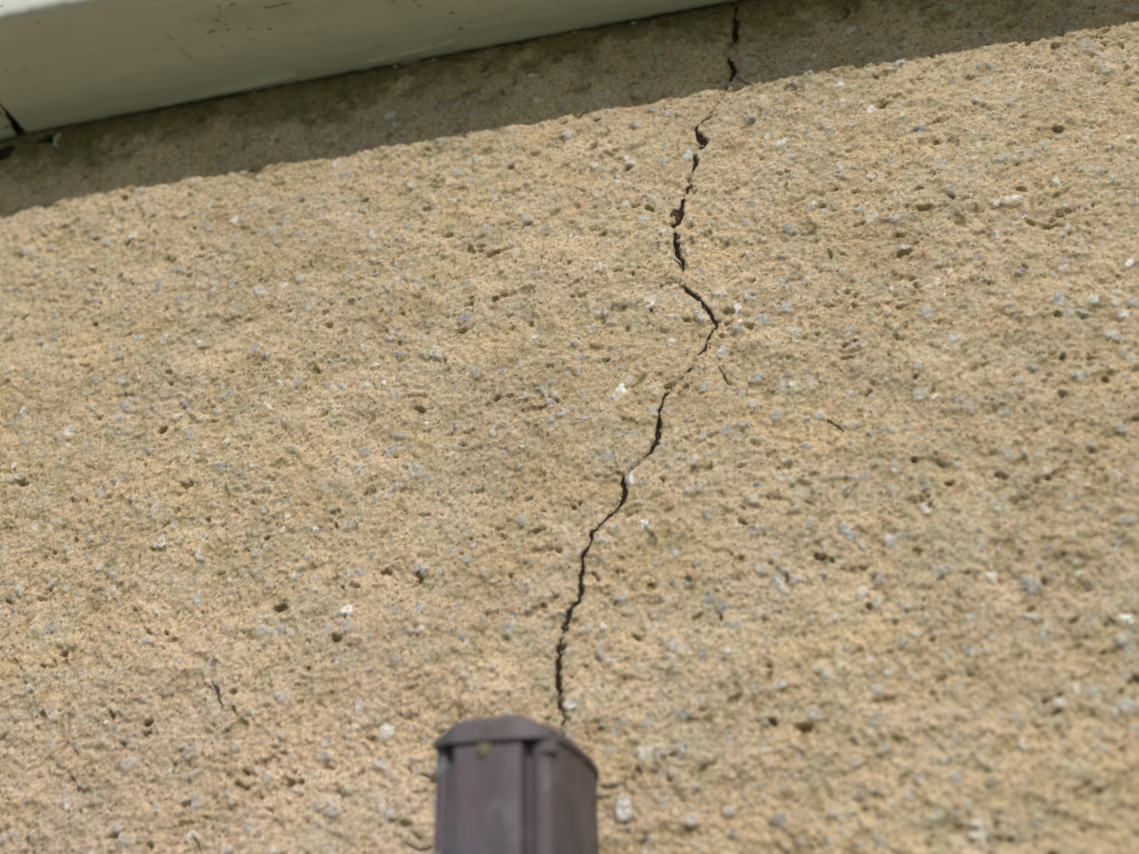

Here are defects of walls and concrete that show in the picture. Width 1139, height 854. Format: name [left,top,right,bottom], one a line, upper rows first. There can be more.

crack [0,104,25,132]
crack [555,7,752,735]